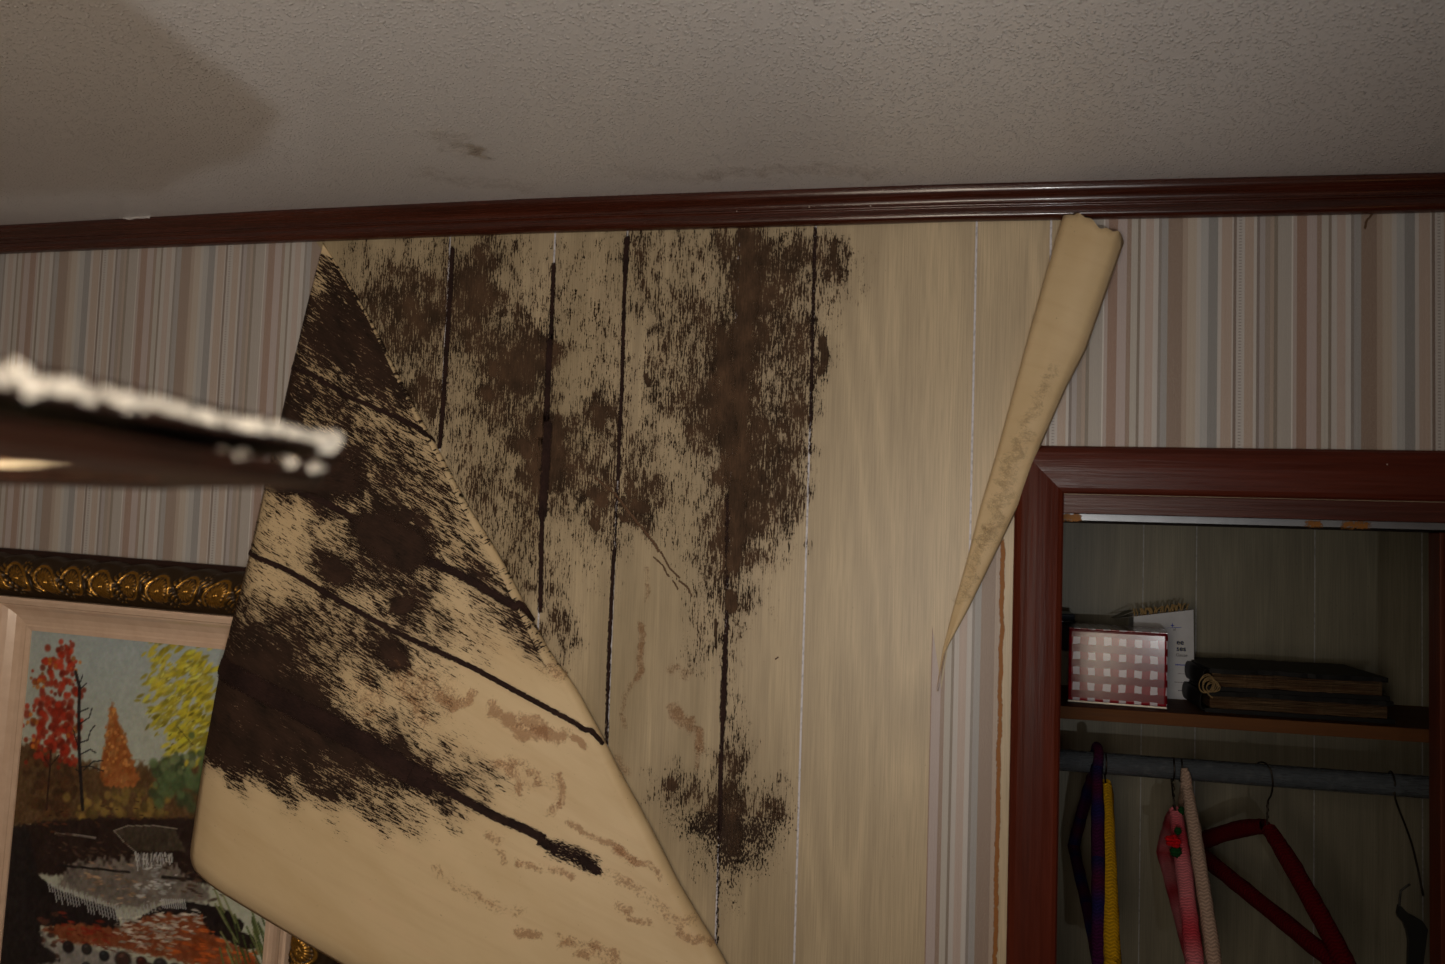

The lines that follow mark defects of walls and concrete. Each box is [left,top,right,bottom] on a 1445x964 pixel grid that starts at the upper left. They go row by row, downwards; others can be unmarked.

peeling [190,243,727,964]
damp [203,226,872,943]